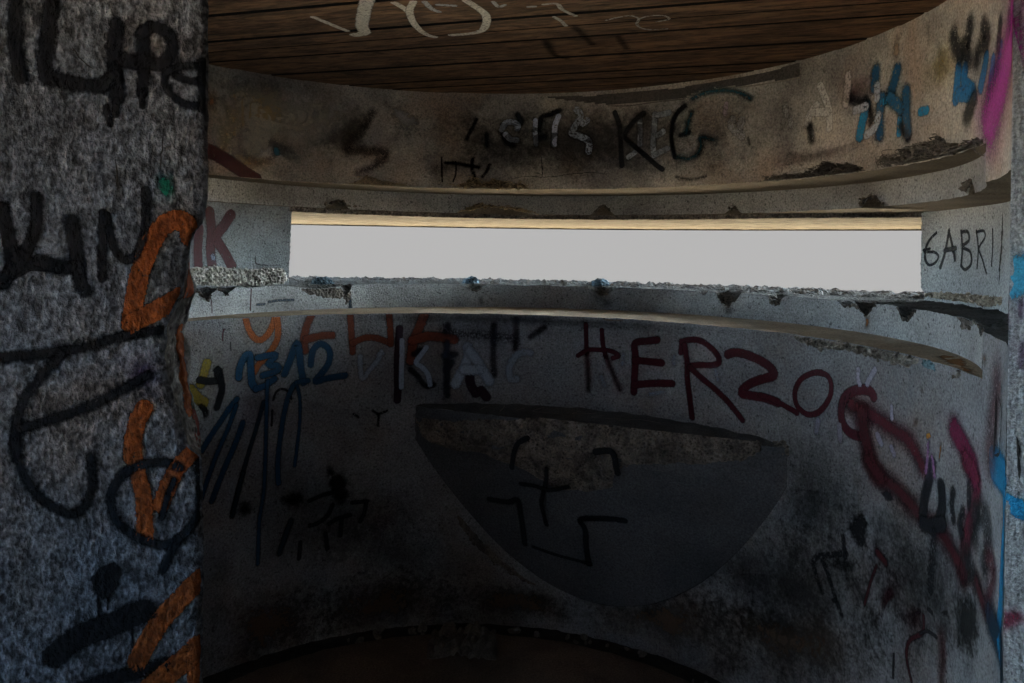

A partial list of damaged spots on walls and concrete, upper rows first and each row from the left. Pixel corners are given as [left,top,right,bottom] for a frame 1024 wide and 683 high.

spalling [762,133,985,181]
spalling [924,291,1002,308]
spalling [165,230,288,458]